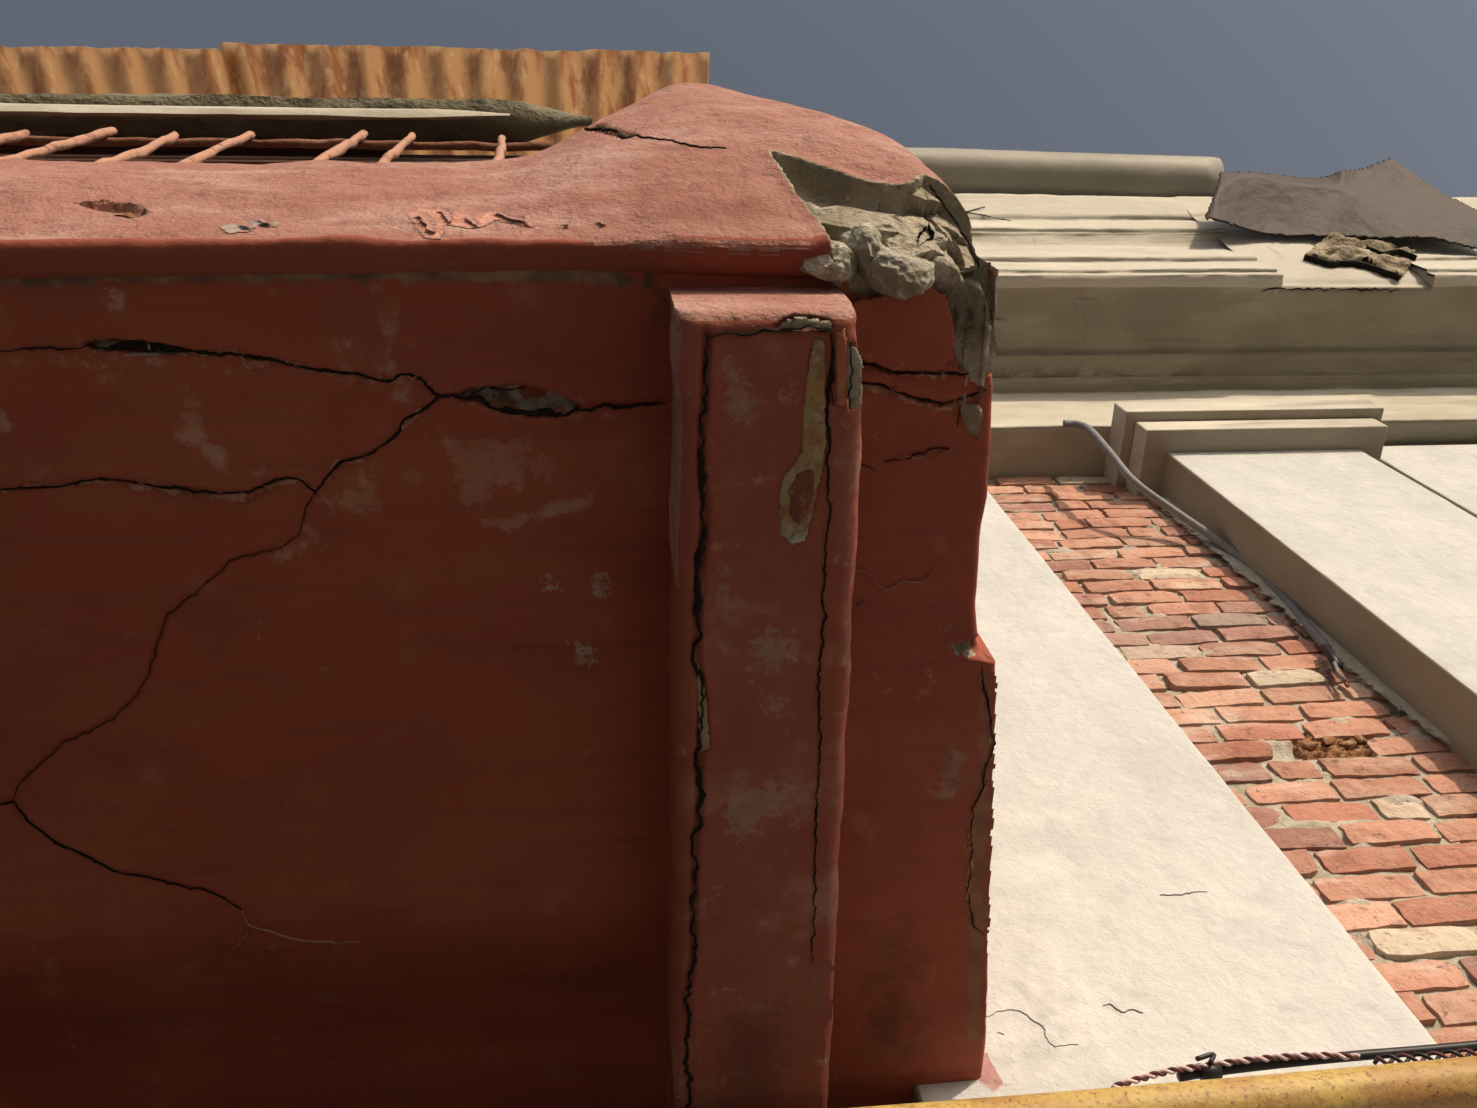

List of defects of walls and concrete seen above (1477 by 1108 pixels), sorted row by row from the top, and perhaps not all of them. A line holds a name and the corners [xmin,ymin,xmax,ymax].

crack [584,126,726,149]
crack [0,342,94,352]
crack [573,402,665,413]
flaking render [706,167,997,545]
crack [0,346,456,957]
crack [683,334,709,1108]
crack [811,336,986,962]
crack [963,667,996,936]
spalling [1292,734,1372,761]